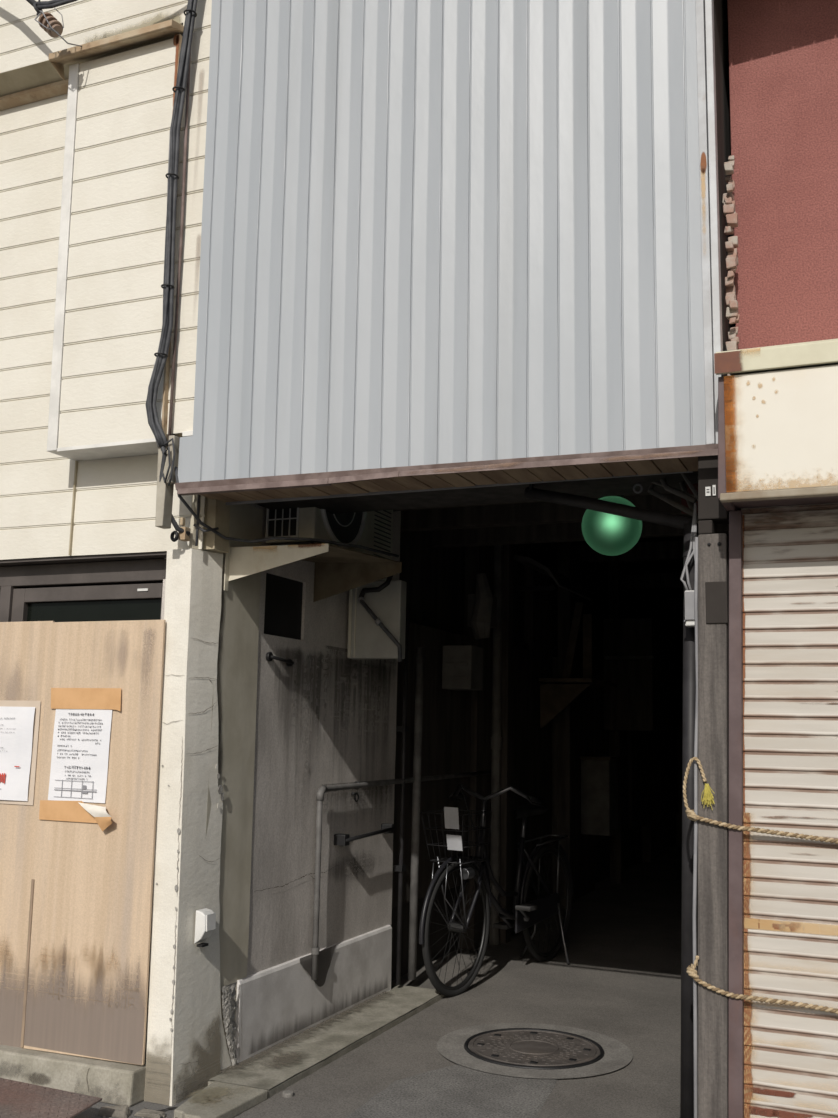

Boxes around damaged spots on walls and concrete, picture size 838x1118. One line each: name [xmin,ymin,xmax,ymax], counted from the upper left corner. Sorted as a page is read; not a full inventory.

corrosion [714,348,838,492]
corrosion [742,515,838,1118]
damp [0,959,391,1105]